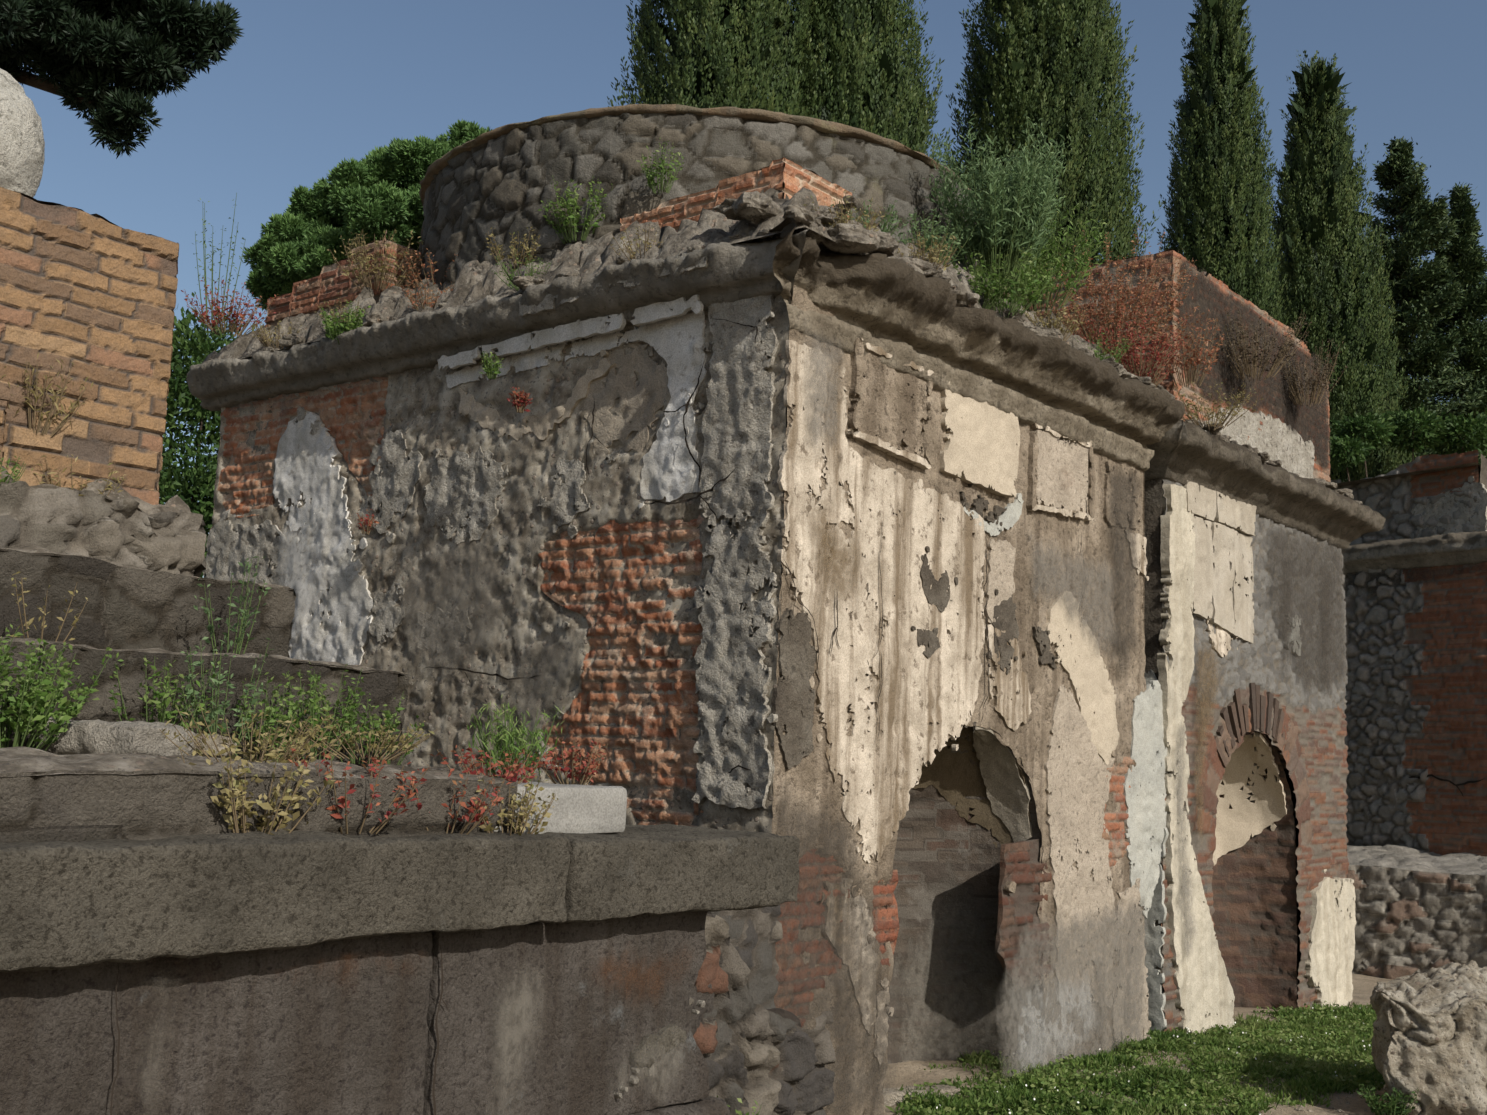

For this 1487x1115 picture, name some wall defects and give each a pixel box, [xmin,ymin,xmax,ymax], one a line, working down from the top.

peeling [659,248,709,277]
damp [1035,477,1135,660]
peeling [203,278,1287,1066]
peeling [1303,869,1356,1008]